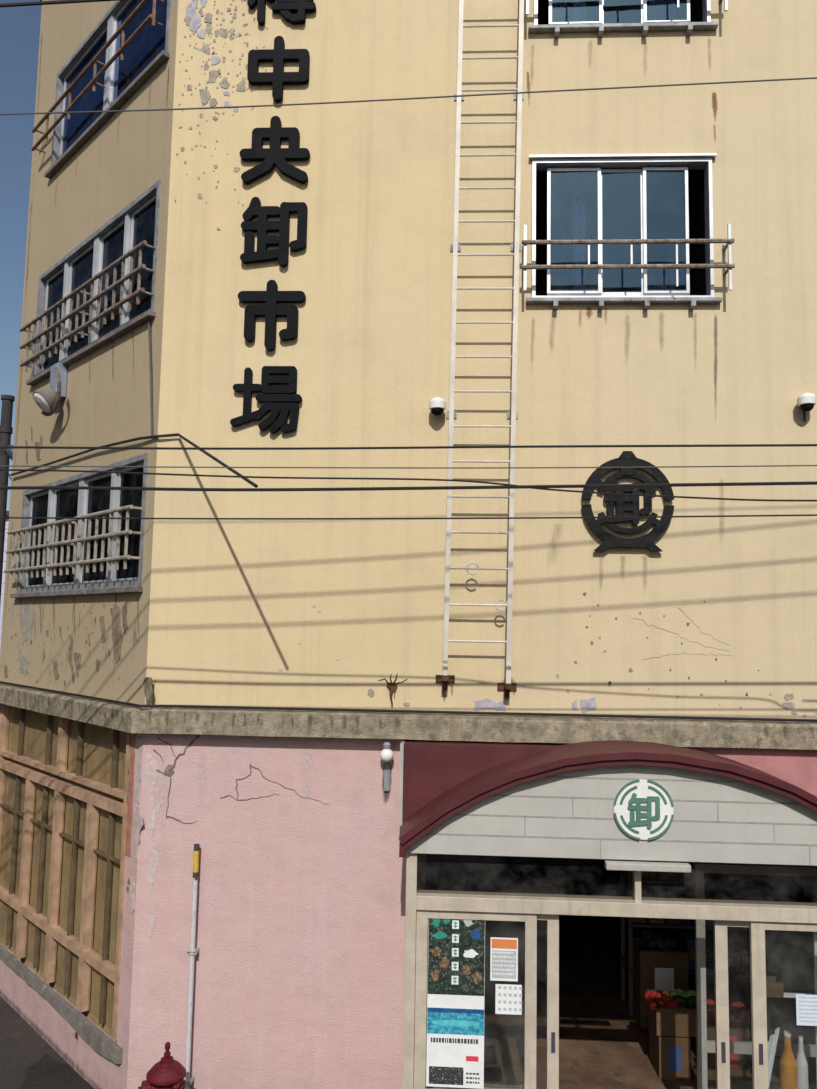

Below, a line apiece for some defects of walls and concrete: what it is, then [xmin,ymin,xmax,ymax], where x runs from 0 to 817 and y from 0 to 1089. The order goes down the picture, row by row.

peeling [176,0,268,189]
peeling [3,597,137,686]
peeling [143,677,153,705]
corrosion [368,673,410,708]
peeling [769,693,817,717]
crack [153,735,200,824]
crack [220,764,323,804]